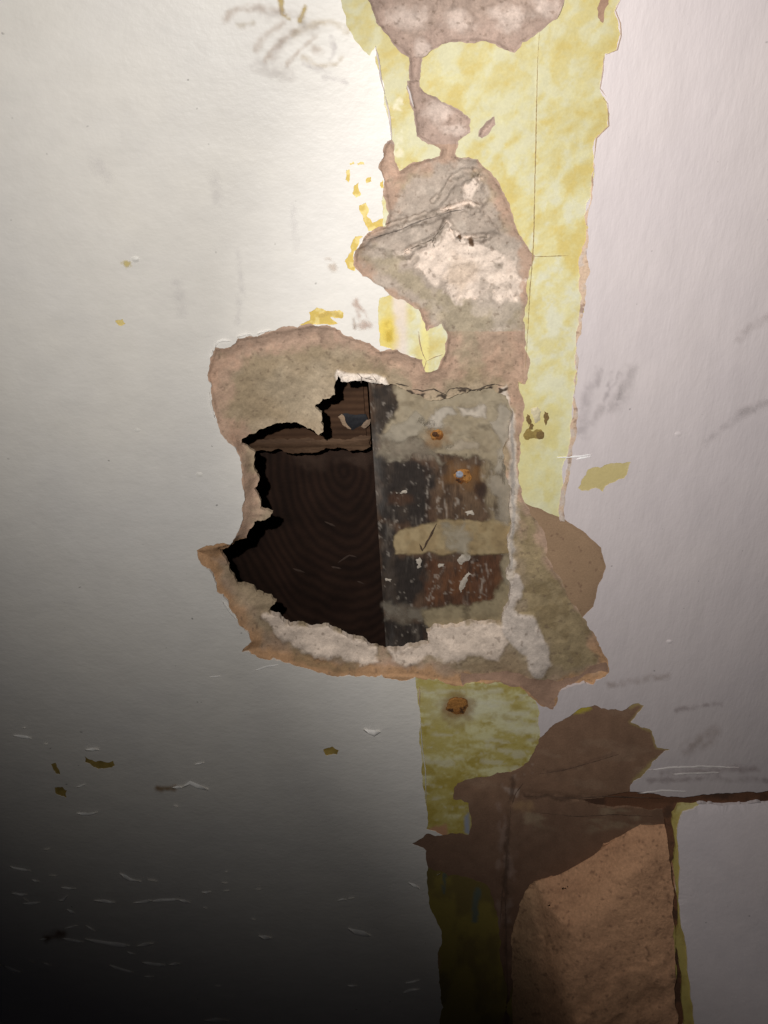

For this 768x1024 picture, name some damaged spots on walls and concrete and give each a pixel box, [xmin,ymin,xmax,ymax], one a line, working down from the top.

peeling [197,0,699,1024]
rust [453,469,472,484]
rust [446,697,468,715]
crack [530,754,768,1024]